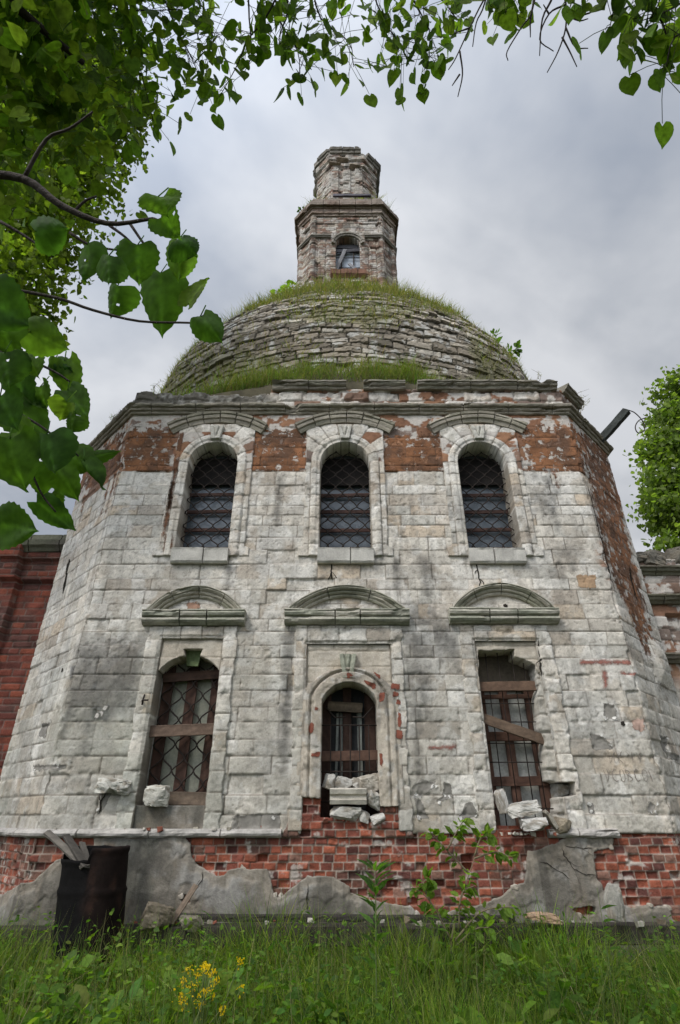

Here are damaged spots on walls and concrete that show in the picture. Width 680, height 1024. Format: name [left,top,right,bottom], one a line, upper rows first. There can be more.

spalling [576,574,596,588]
spalling [0,836,94,896]
spalling [186,779,563,915]
crack [541,845,596,881]
spalling [594,833,680,921]
spalling [573,906,593,920]